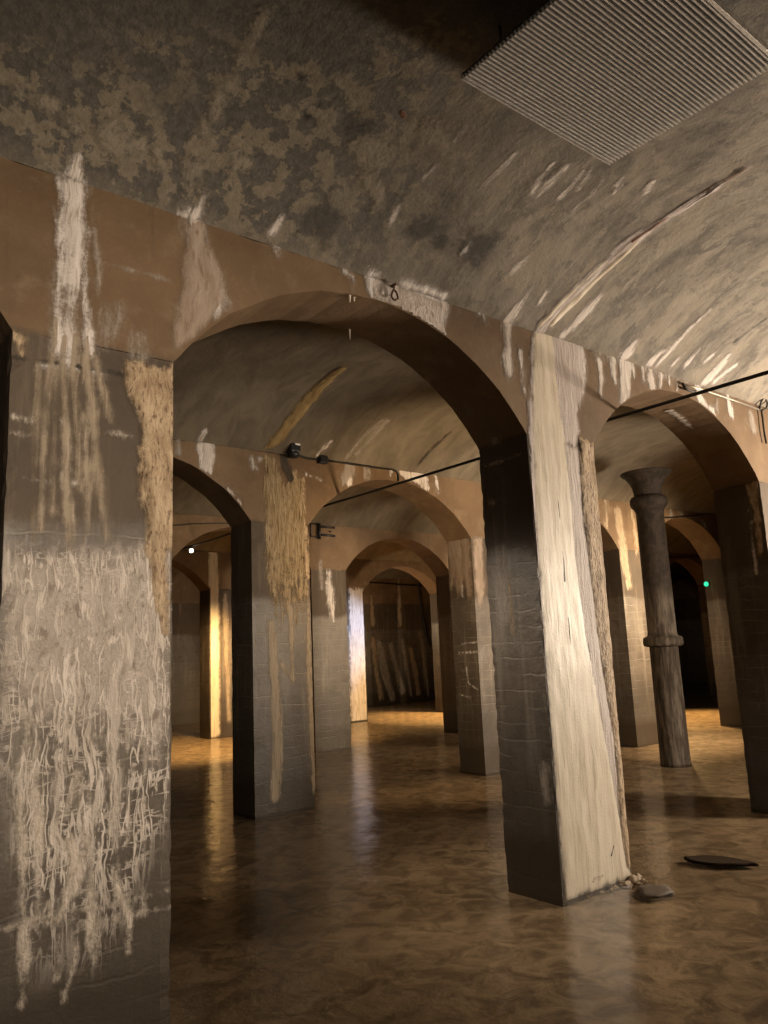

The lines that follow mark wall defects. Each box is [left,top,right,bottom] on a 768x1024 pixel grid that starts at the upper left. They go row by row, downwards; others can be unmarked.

damp [267,216,284,246]
damp [502,162,748,393]
damp [597,309,738,418]
damp [0,153,170,1009]
spalling [125,360,173,635]